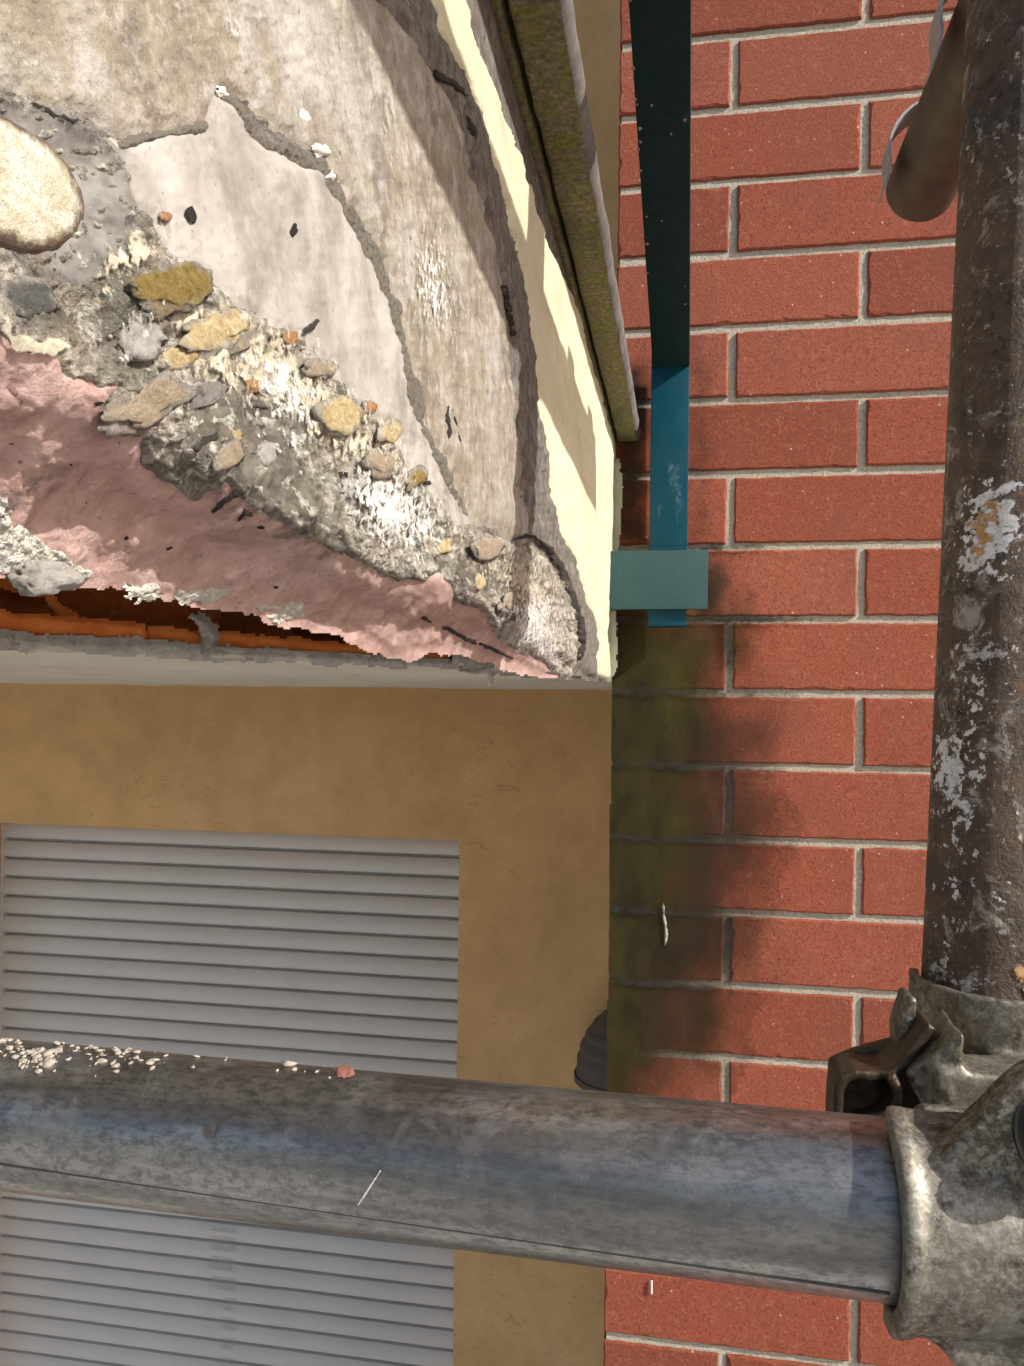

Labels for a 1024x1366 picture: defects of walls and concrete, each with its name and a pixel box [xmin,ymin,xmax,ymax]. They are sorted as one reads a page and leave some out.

flaking render [0,0,601,687]
damp [611,903,739,959]